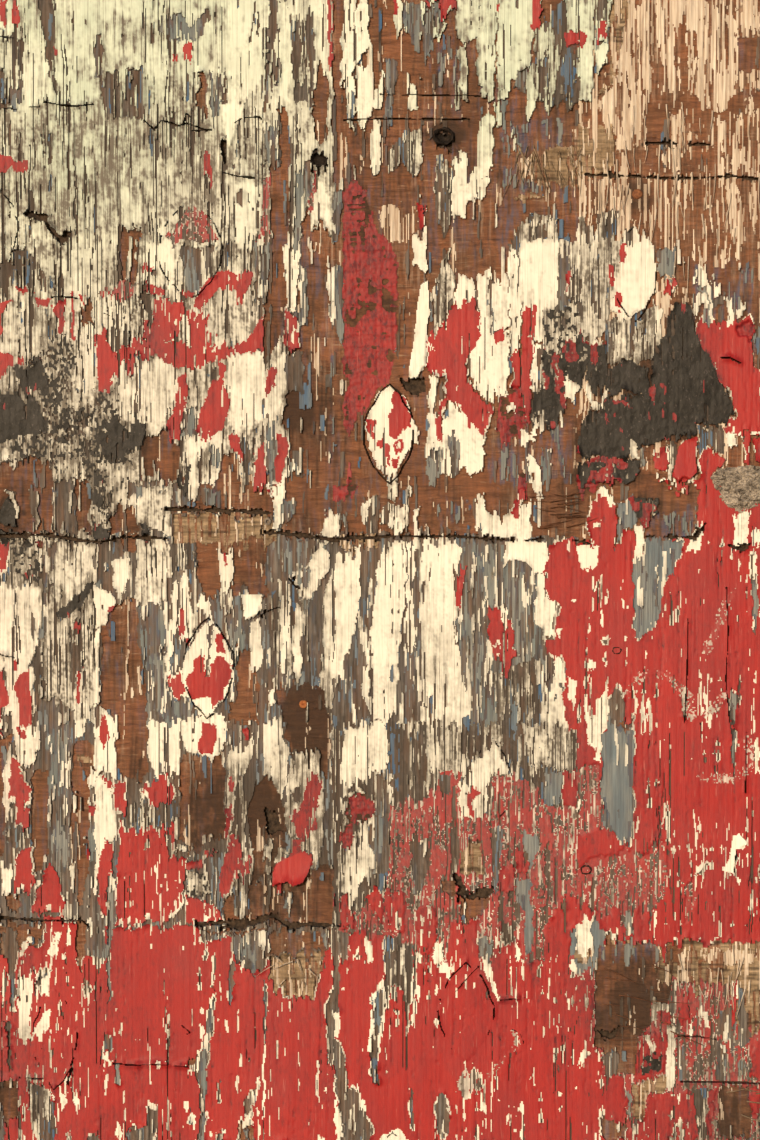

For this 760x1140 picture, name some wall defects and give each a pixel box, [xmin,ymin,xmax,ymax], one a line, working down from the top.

peeling [344,0,760,337]
peeling [165,59,596,756]
peeling [0,454,101,540]
crack [0,505,545,544]
peeling [631,533,683,641]
crack [645,523,706,541]
crack [728,543,750,553]
peeling [100,593,152,783]
peeling [178,672,338,930]
crack [0,916,89,928]
crack [195,912,341,932]
peeling [590,935,760,1070]